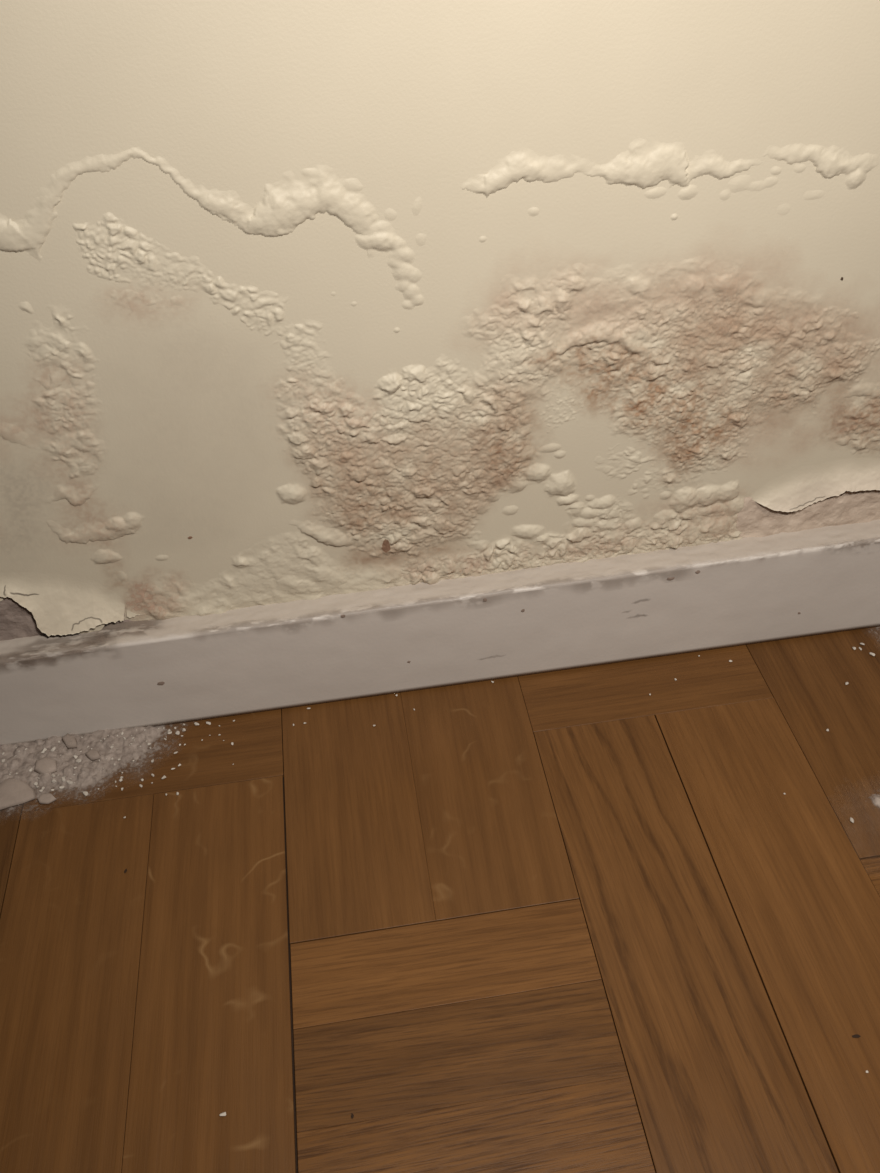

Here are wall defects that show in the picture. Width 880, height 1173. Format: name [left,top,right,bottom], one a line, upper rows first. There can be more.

peeling [736,458,880,538]
peeling [0,572,146,641]